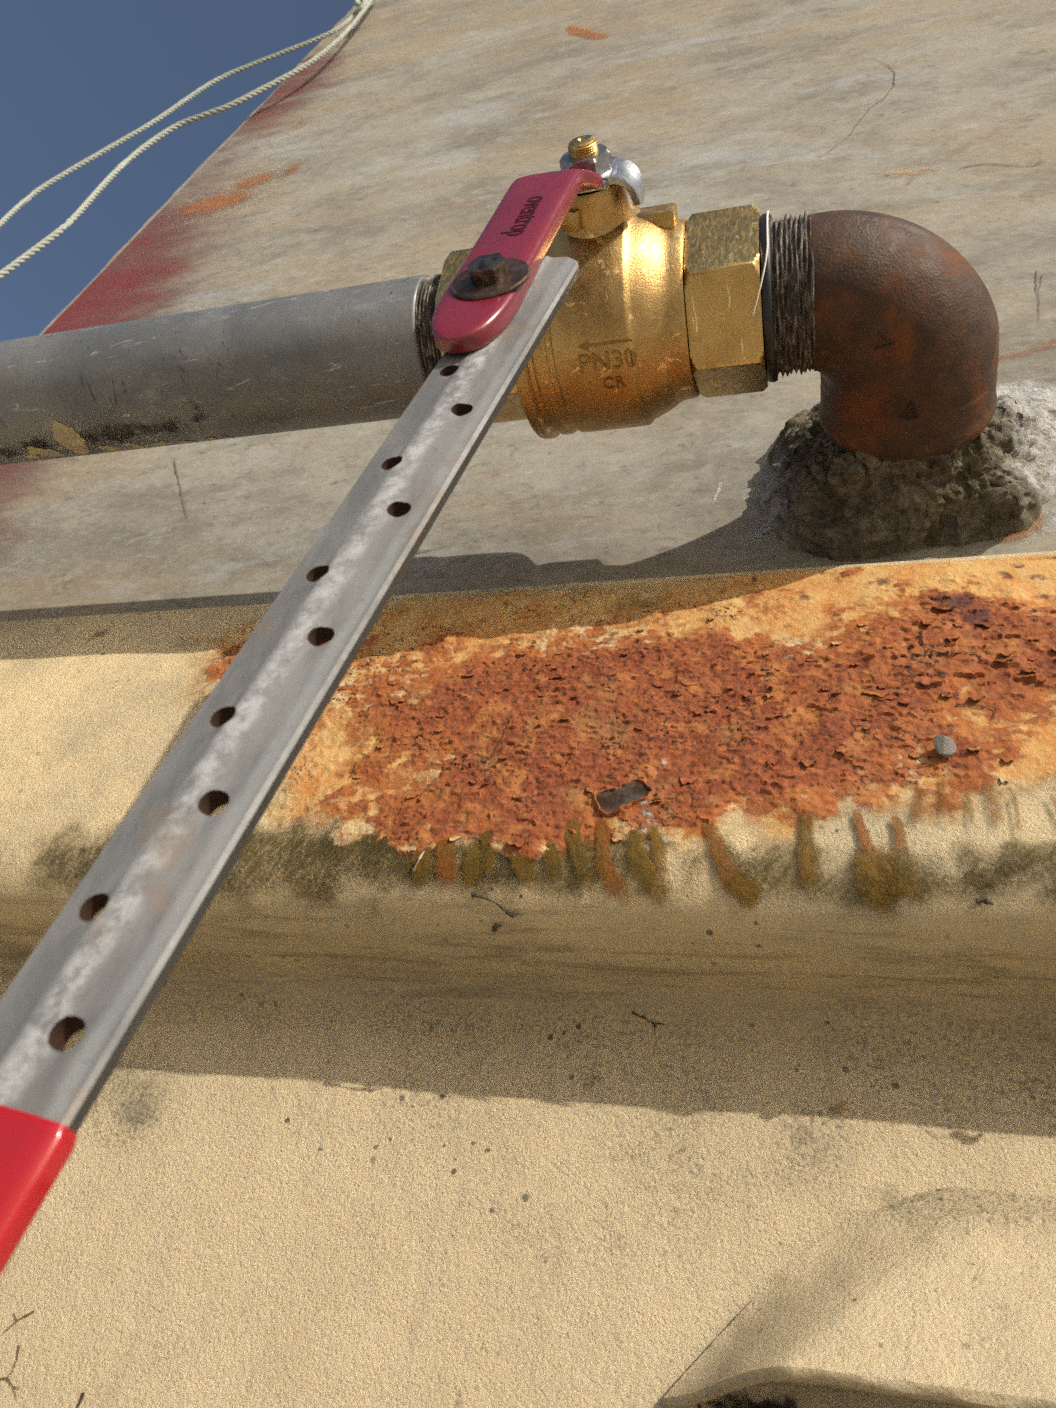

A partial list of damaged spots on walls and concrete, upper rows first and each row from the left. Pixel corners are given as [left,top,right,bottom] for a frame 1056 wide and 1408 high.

corrosion [566,25,607,39]
damp [996,382,1056,409]
corrosion [512,819,669,905]
corrosion [703,820,761,909]
corrosion [798,812,819,882]
corrosion [853,791,924,911]
crack [0,1311,34,1399]
damp [698,1394,797,1408]